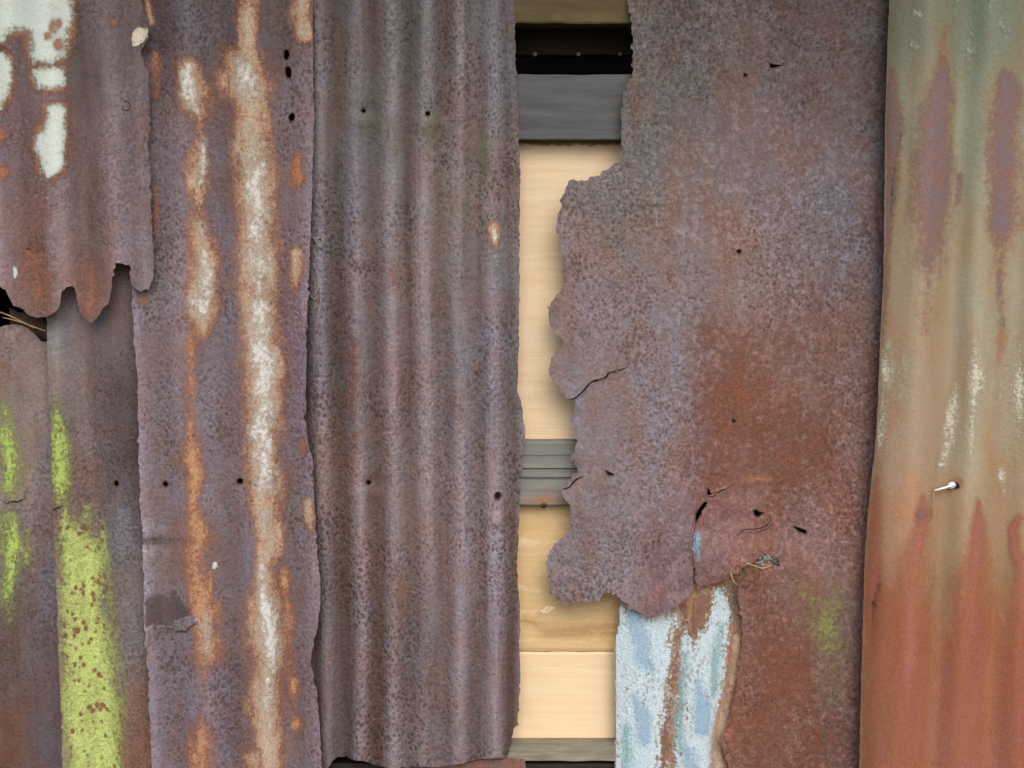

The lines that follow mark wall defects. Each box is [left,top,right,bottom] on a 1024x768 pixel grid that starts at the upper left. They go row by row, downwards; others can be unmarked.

peeling [0,0,73,111]
peeling [34,103,67,178]
rust [882,71,903,342]
rust [986,71,1021,301]
rust [0,0,526,768]
crack [566,366,628,400]
crack [734,514,773,538]
peeling [616,586,733,768]
rust [660,592,712,768]
rust [711,632,742,768]